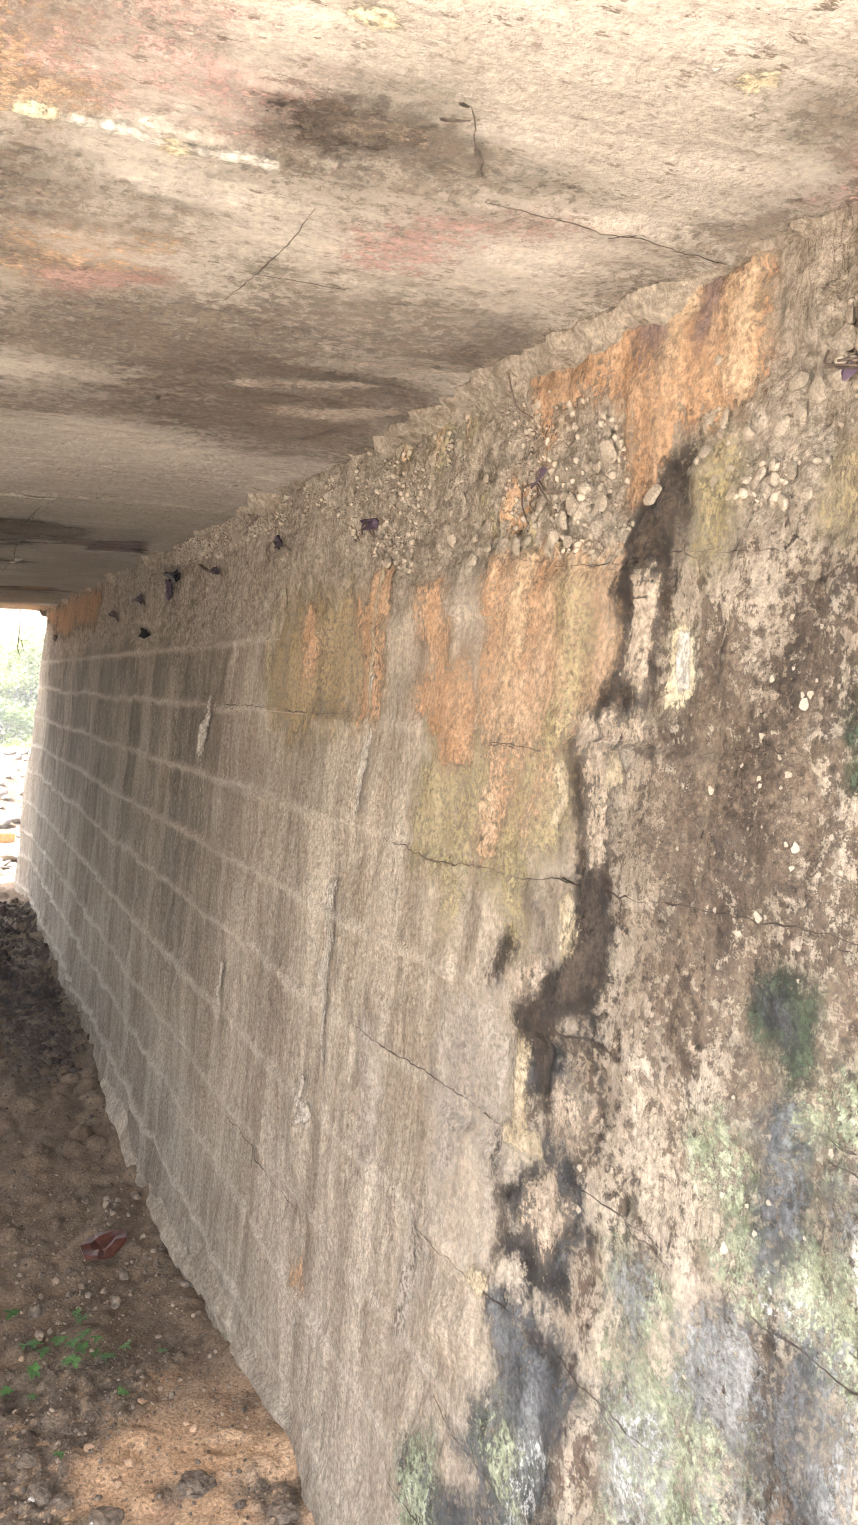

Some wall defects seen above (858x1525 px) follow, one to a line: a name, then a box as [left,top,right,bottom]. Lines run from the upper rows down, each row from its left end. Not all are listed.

water stain [0,0,858,463]
spalling [694,258,858,515]
flaking render [799,678,818,711]
flaking render [756,754,793,790]
crack [384,837,858,954]
flaking render [784,841,800,872]
water stain [393,431,858,1525]
water stain [355,1018,381,1155]